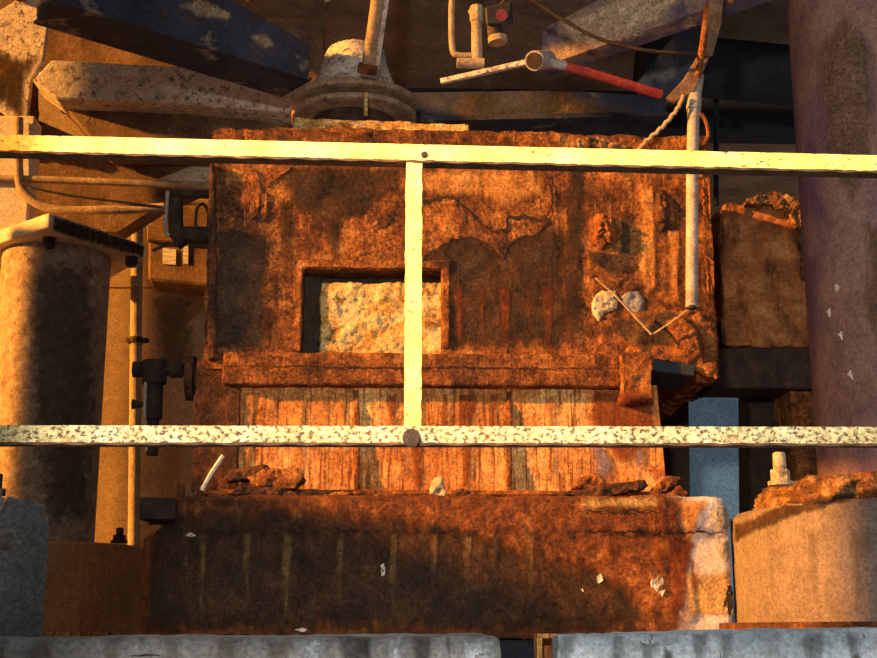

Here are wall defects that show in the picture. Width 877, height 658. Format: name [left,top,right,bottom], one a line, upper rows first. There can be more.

rust [819,20,874,155]
crack [422,195,454,203]
crack [487,171,559,283]
rust [0,150,877,347]
rust [244,393,253,426]
rust [388,395,396,418]
rust [459,395,477,426]
rust [589,391,651,427]
rust [0,442,877,633]